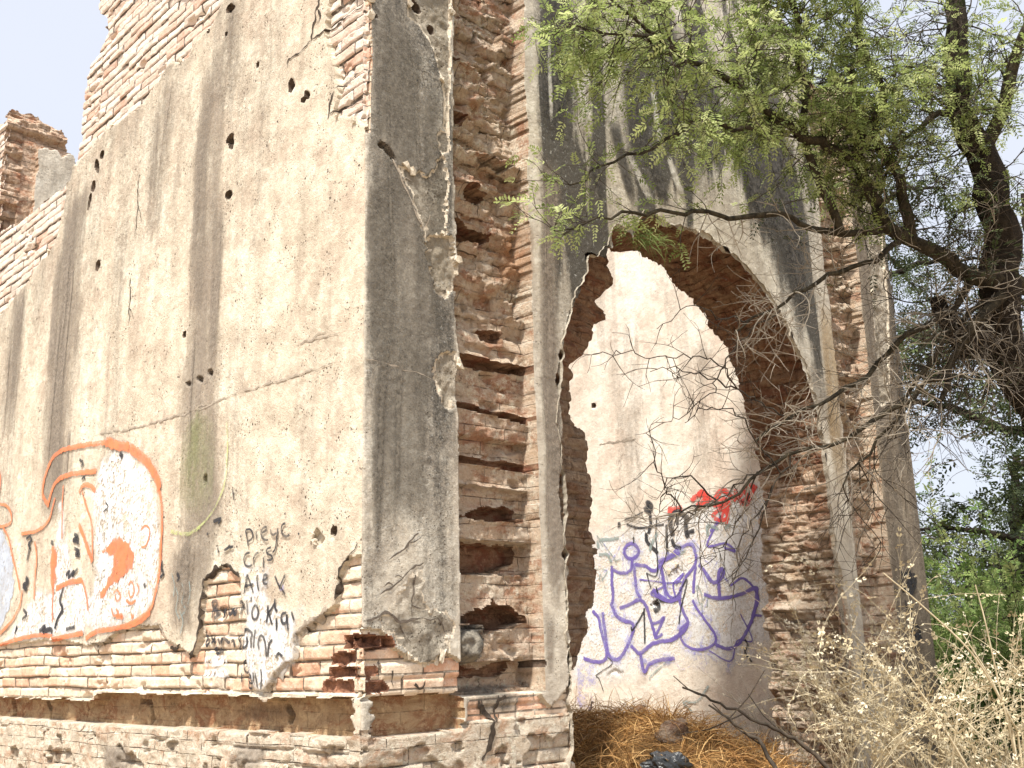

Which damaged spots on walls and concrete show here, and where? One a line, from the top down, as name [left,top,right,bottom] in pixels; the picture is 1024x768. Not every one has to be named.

leakage [44,193,86,516]
leakage [172,59,229,630]
spalling [0,0,568,737]
leakage [369,8,437,522]
spalling [559,256,613,670]